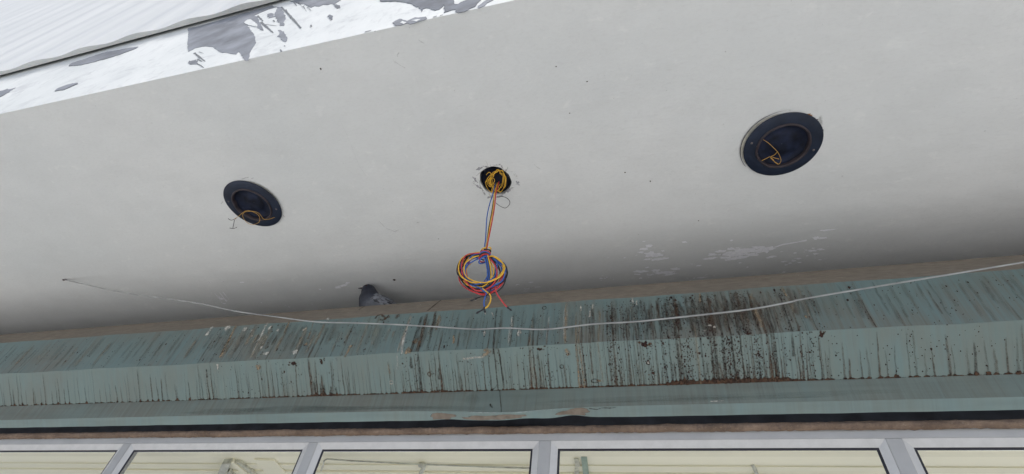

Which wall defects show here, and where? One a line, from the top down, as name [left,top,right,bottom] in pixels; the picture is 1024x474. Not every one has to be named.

peeling [380,0,493,26]
peeling [187,0,341,68]
peeling [69,46,139,66]
peeling [704,229,835,268]
corrosion [2,316,1024,406]